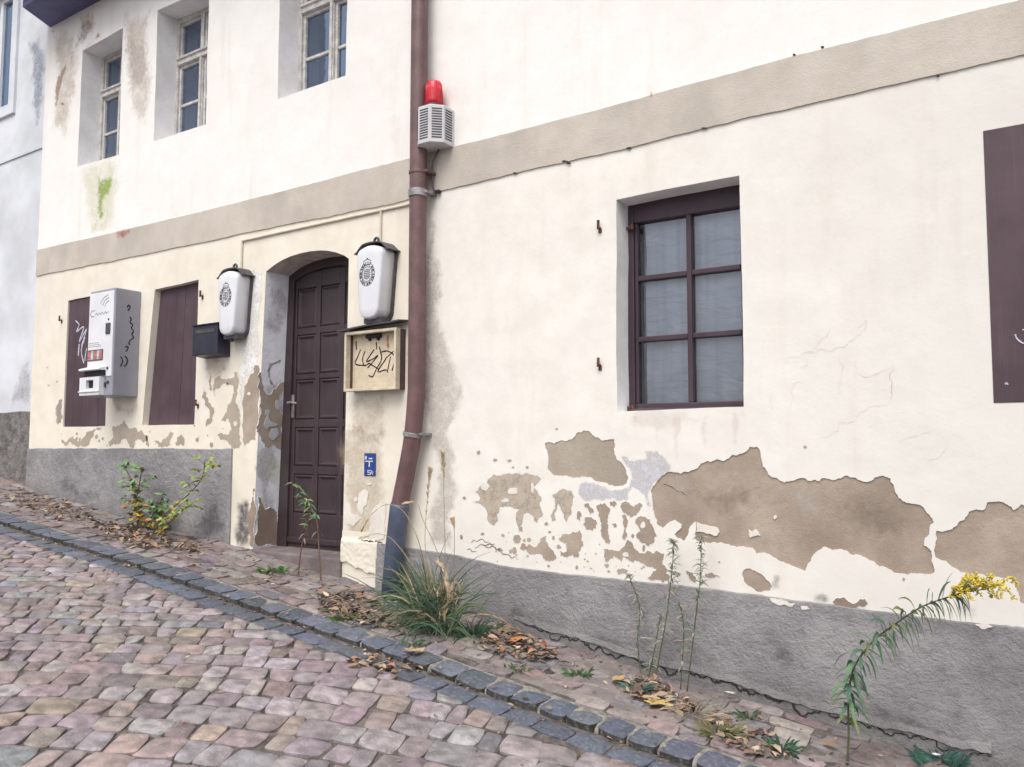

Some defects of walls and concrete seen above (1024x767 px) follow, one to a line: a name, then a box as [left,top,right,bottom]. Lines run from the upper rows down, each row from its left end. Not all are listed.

water stain [99,180,110,217]
peeling [55,362,284,451]
flaking render [246,487,278,547]
peeling [463,458,721,583]